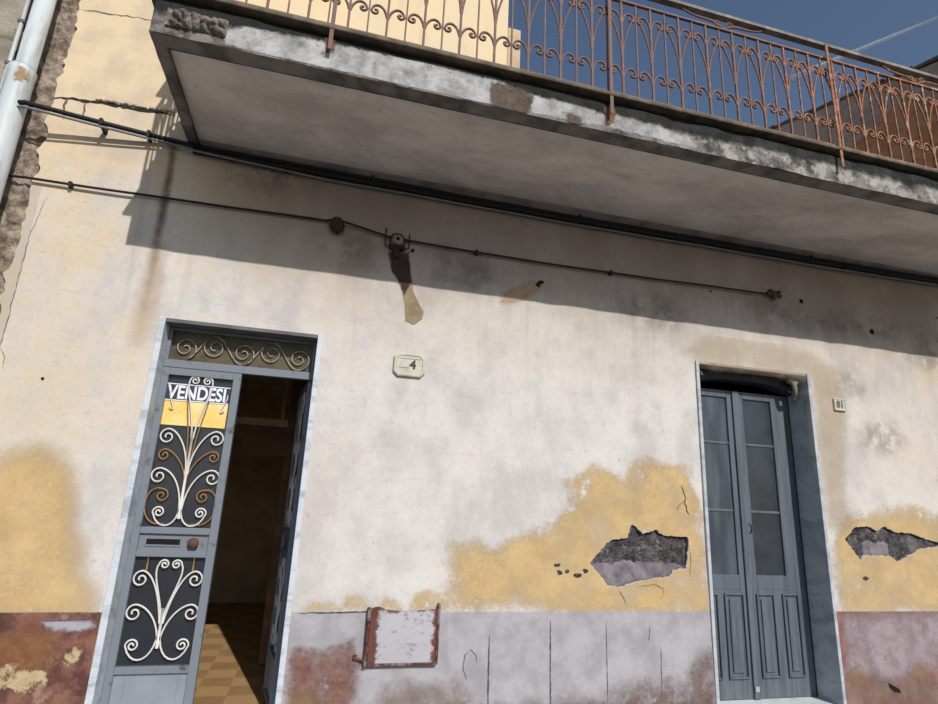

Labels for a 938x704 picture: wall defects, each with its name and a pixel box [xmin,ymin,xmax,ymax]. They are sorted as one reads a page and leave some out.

crack [55,97,175,119]
crack [82,9,149,20]
peeling [165,7,694,148]
leakage [157,146,174,231]
peeling [0,450,91,612]
peeling [412,458,710,612]
peeling [836,508,938,693]
leakage [625,657,714,704]